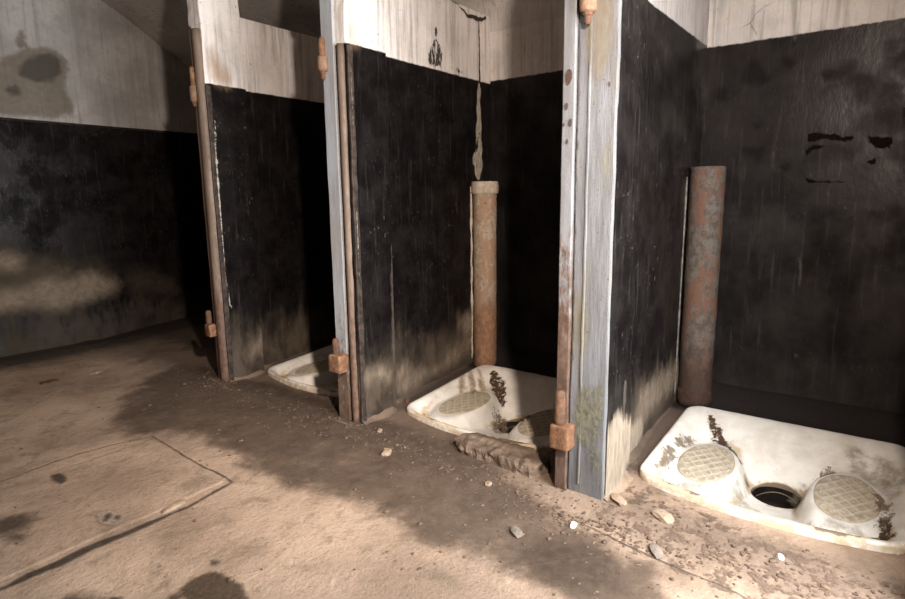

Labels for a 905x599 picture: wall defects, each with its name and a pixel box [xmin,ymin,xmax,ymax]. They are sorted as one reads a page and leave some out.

water stain [0,33,72,117]
peeling [806,133,854,155]
peeling [868,136,893,164]
water stain [0,249,117,314]
water stain [117,365,661,599]